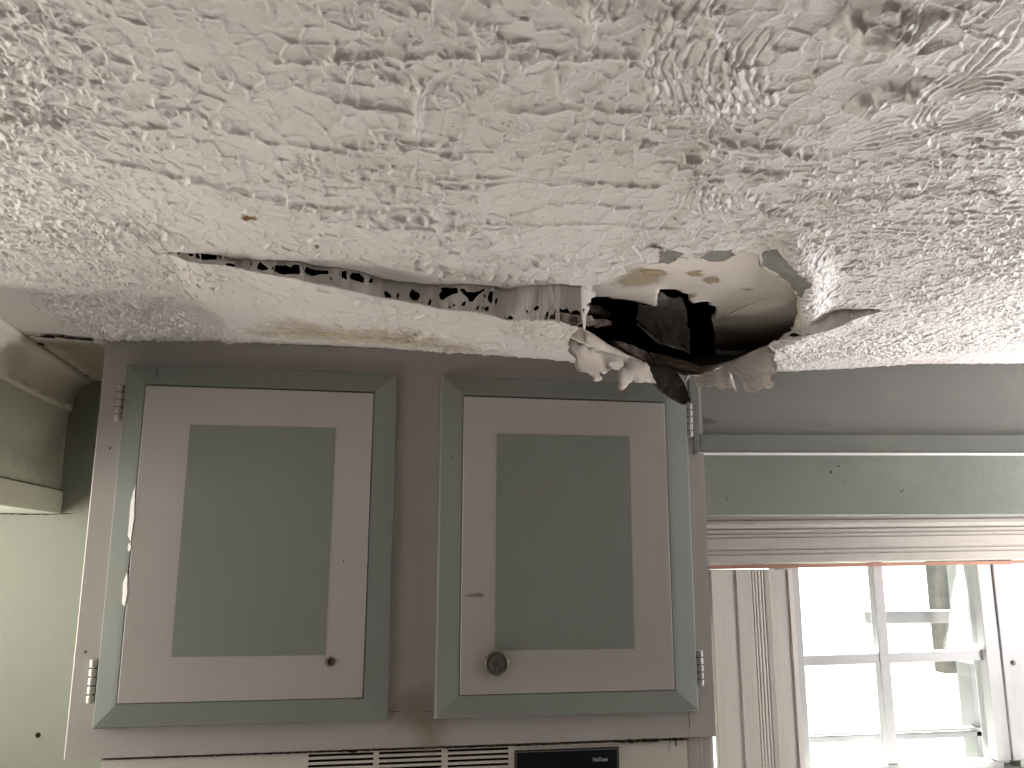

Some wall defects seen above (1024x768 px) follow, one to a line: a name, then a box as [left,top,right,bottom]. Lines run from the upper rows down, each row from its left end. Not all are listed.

peeling [658,250,684,264]
peeling [700,250,735,262]
damp [621,270,665,285]
damp [687,271,719,283]
peeling [760,249,813,298]